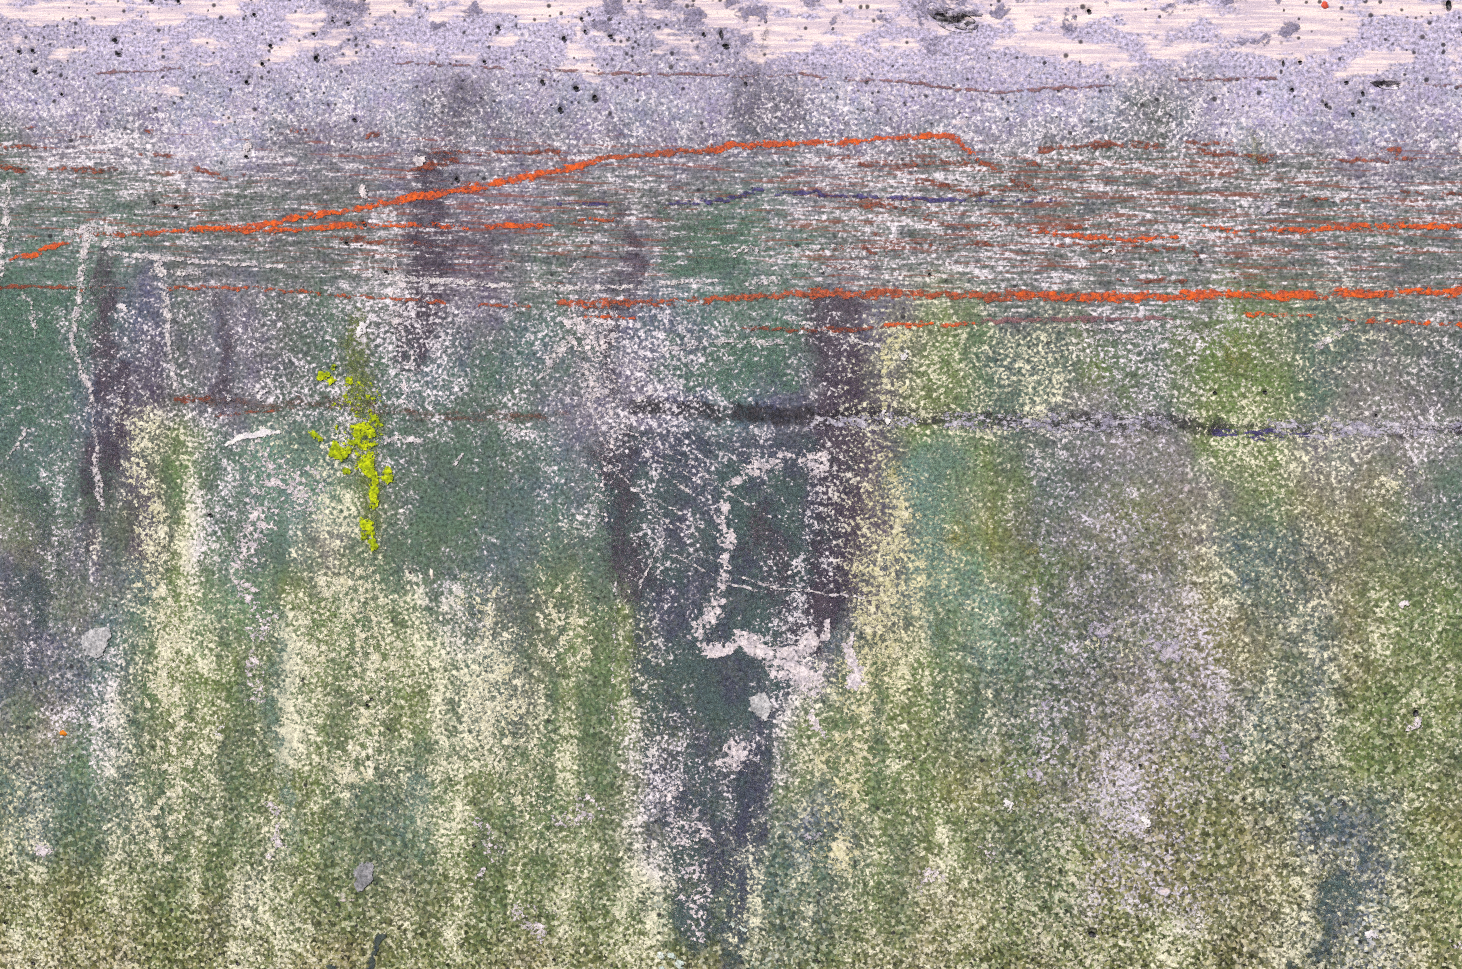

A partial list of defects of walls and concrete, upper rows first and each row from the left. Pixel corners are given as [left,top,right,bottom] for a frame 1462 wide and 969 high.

corrosion [0,126,46,173]
corrosion [48,165,118,174]
corrosion [407,148,561,172]
corrosion [802,155,1035,198]
corrosion [822,201,1199,257]
leakage [0,132,1057,551]
leakage [524,202,1462,969]